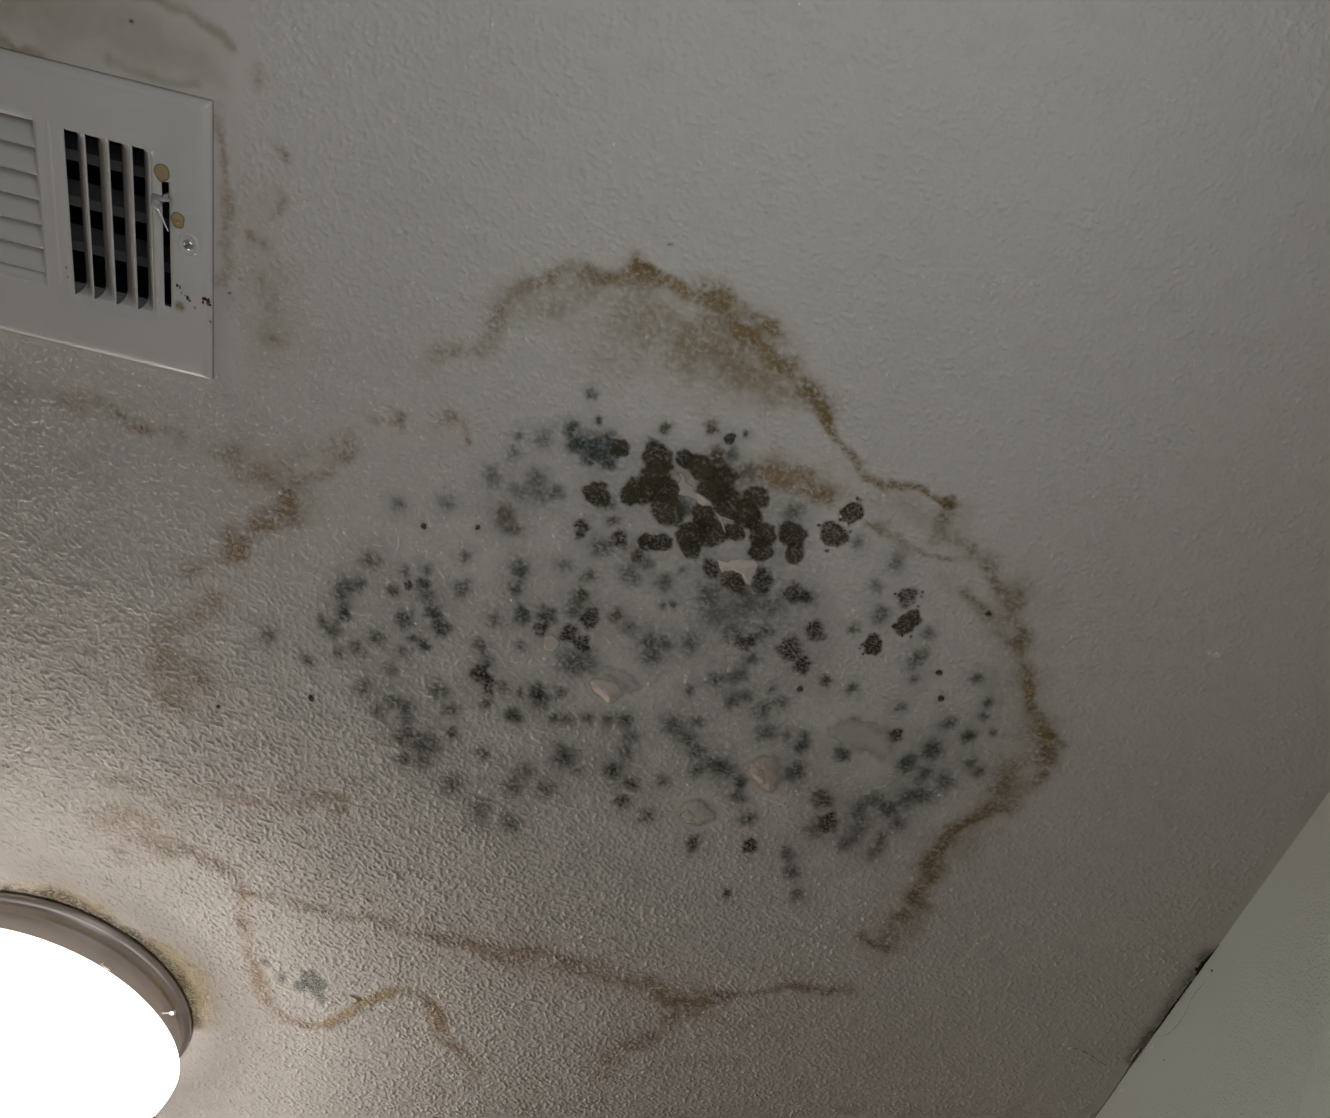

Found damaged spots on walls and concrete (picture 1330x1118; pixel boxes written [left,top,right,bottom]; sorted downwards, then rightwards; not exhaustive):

damp [586,259,688,296]
damp [689,290,793,389]
damp [803,387,952,507]
damp [567,417,864,617]
damp [389,568,449,650]
damp [471,645,494,707]
damp [520,573,630,670]
damp [776,621,823,691]
damp [850,589,930,655]
damp [814,790,837,831]
damp [295,971,327,1003]